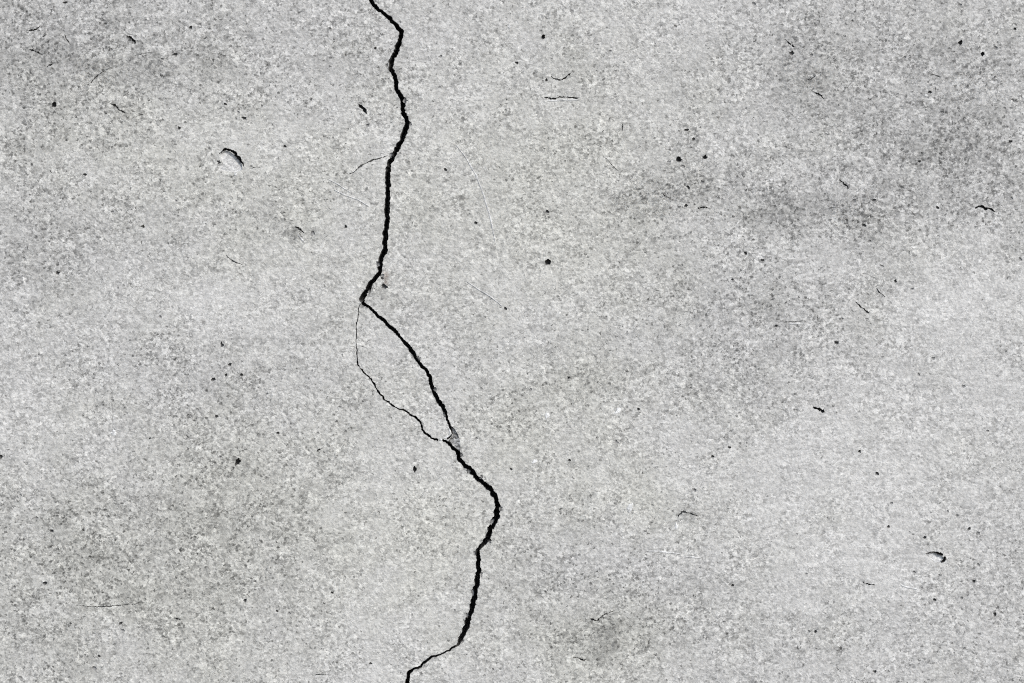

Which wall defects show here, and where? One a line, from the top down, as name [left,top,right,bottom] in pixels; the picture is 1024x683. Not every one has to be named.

crack [349,0,503,683]